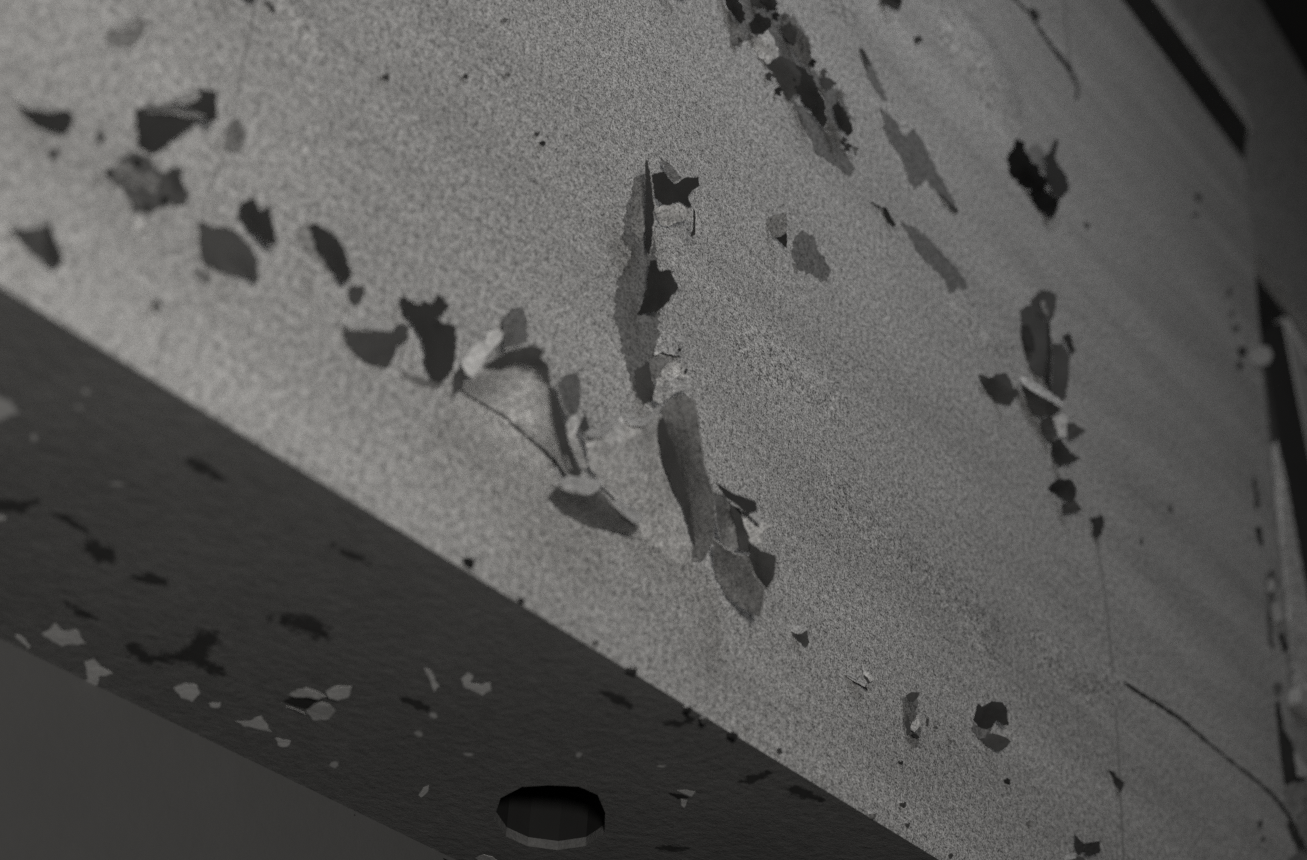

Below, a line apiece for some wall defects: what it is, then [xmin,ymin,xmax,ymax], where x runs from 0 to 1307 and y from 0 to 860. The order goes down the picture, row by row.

peeling [14,93,75,133]
peeling [104,87,246,234]
peeling [725,0,859,178]
peeling [1006,138,1069,218]
crack [1014,0,1079,101]
peeling [6,213,64,270]
peeling [193,197,279,284]
peeling [296,158,777,617]
peeling [978,289,1104,538]
peeling [898,692,957,765]
peeling [971,701,1011,751]
crack [1094,537,1296,860]